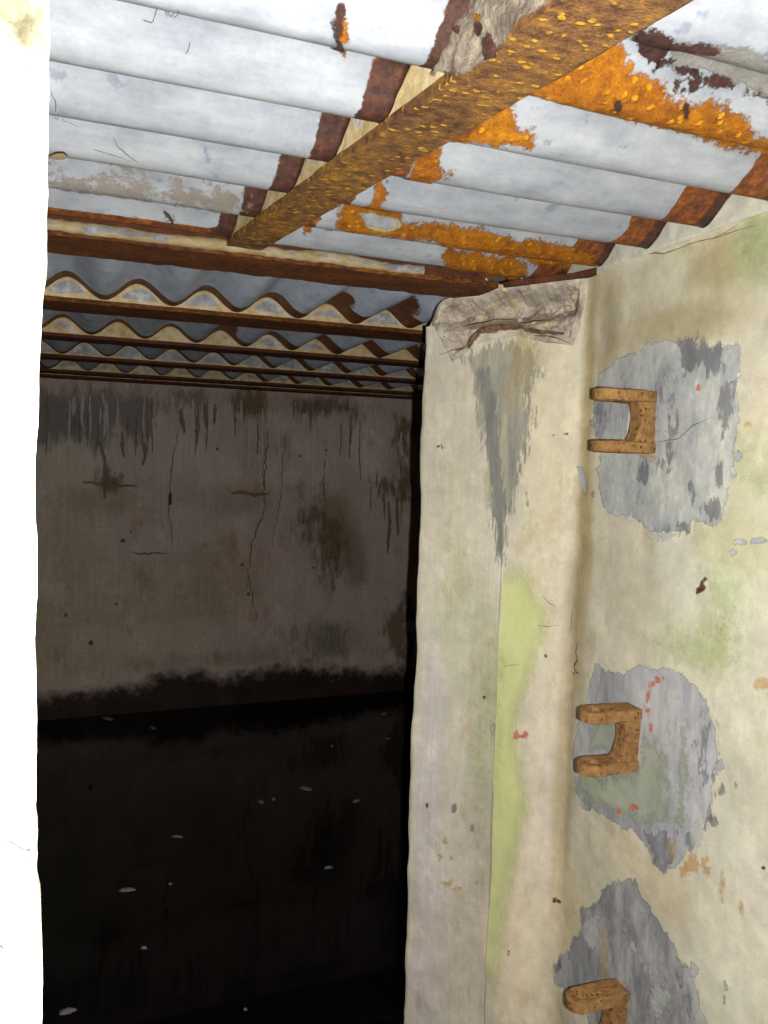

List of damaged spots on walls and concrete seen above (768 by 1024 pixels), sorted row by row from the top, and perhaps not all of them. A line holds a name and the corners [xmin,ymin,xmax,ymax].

corrosion [330,3,349,57]
corrosion [404,105,535,184]
corrosion [532,41,768,167]
corrosion [330,181,597,281]
water stain [37,385,164,498]
water stain [174,390,217,453]
crack [246,430,286,618]
water stain [278,398,413,553]
water stain [460,338,544,566]
peeling [577,338,743,542]
peeling [572,663,724,874]
peeling [554,878,708,1024]